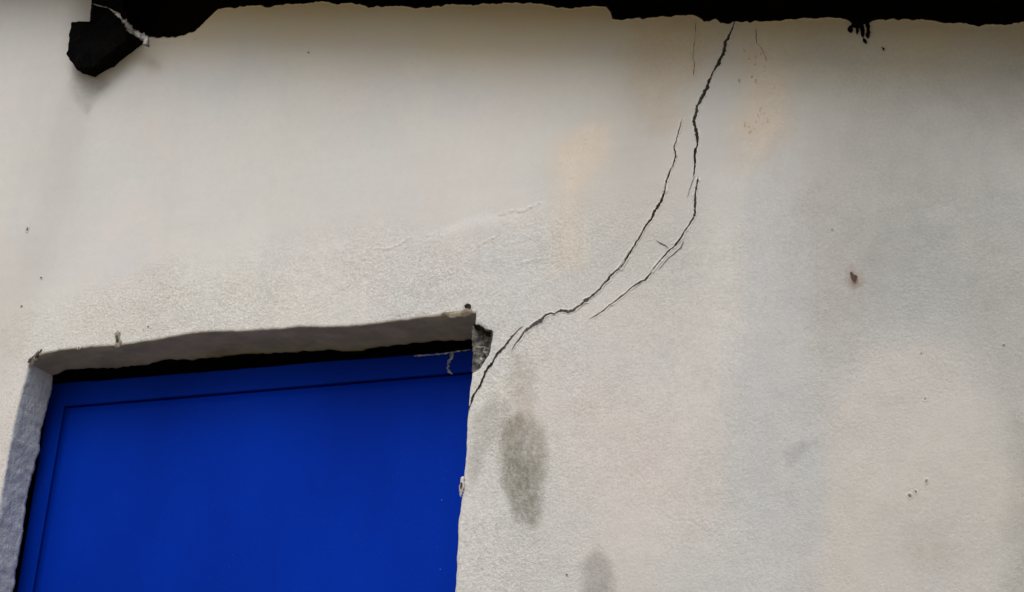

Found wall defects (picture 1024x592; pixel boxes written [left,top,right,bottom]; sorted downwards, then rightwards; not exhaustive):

crack [469,22,765,409]
flaking render [440,302,493,372]
damp [503,417,541,518]